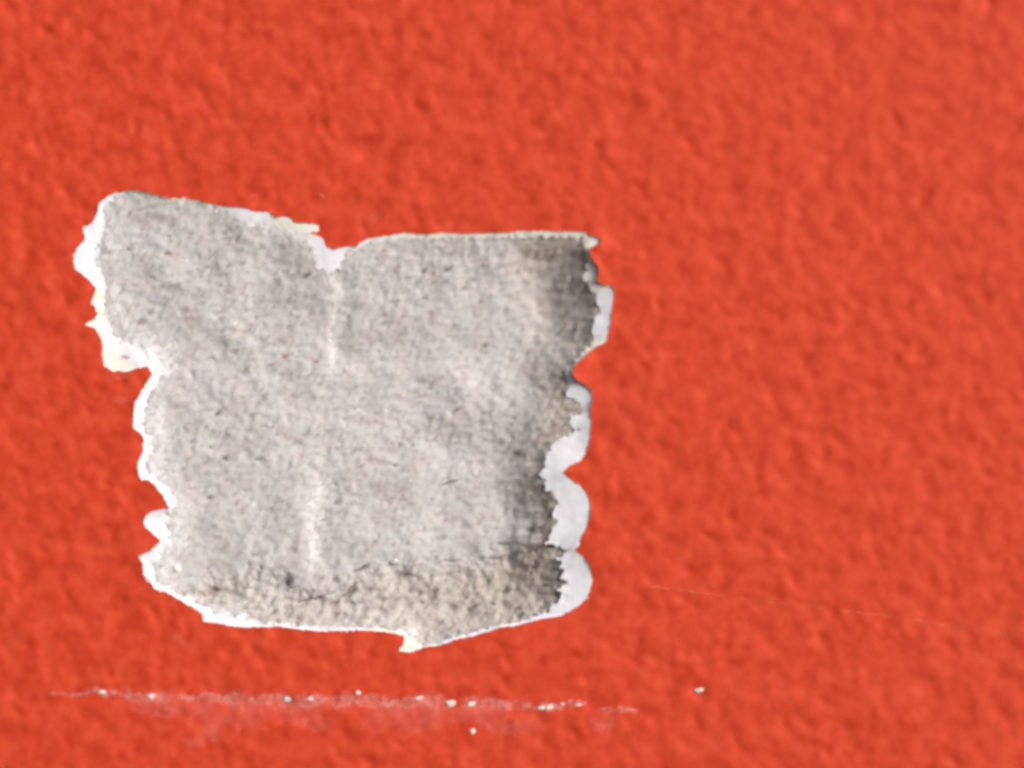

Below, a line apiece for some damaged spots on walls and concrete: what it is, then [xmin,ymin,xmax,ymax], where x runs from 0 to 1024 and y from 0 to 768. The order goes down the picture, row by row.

spalling [73,190,614,653]